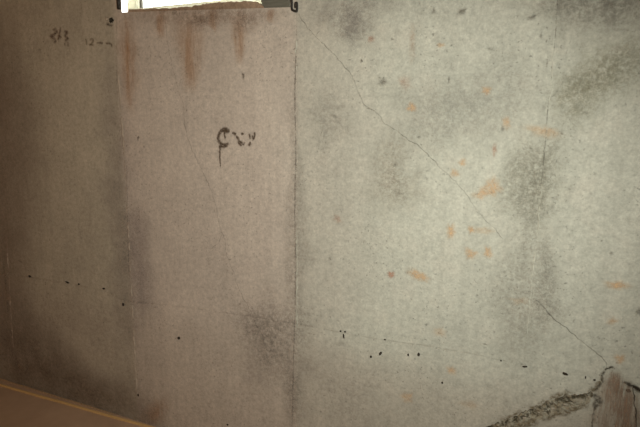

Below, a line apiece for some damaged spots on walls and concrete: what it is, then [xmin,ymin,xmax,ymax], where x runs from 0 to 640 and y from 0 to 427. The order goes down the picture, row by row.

spalling [487,367,613,427]